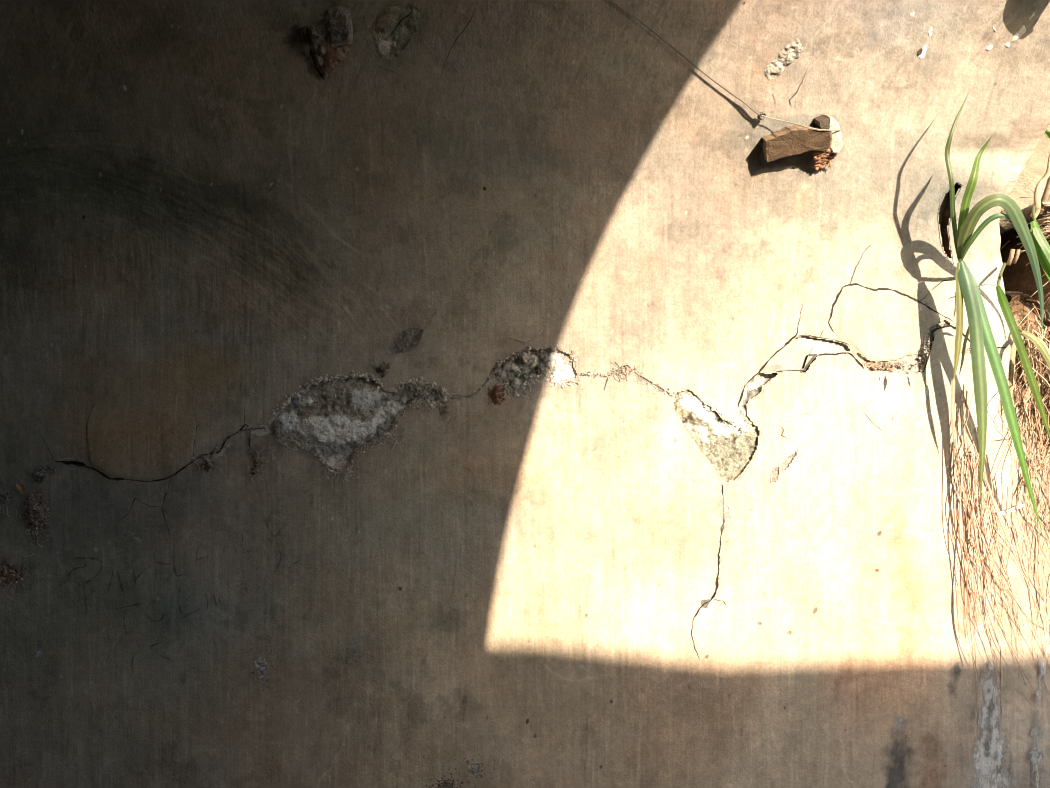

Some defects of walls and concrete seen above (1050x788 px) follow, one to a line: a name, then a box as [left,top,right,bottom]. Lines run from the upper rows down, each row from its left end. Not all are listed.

crack [39,379,270,536]
spalling [262,370,450,475]
spalling [386,327,423,356]
spalling [492,344,580,398]
crack [580,363,675,398]
spalling [672,318,956,485]
crack [738,182,971,430]
crack [691,485,733,657]
damp [886,740,912,788]
damp [971,662,1014,788]
damp [1036,646,1050,705]